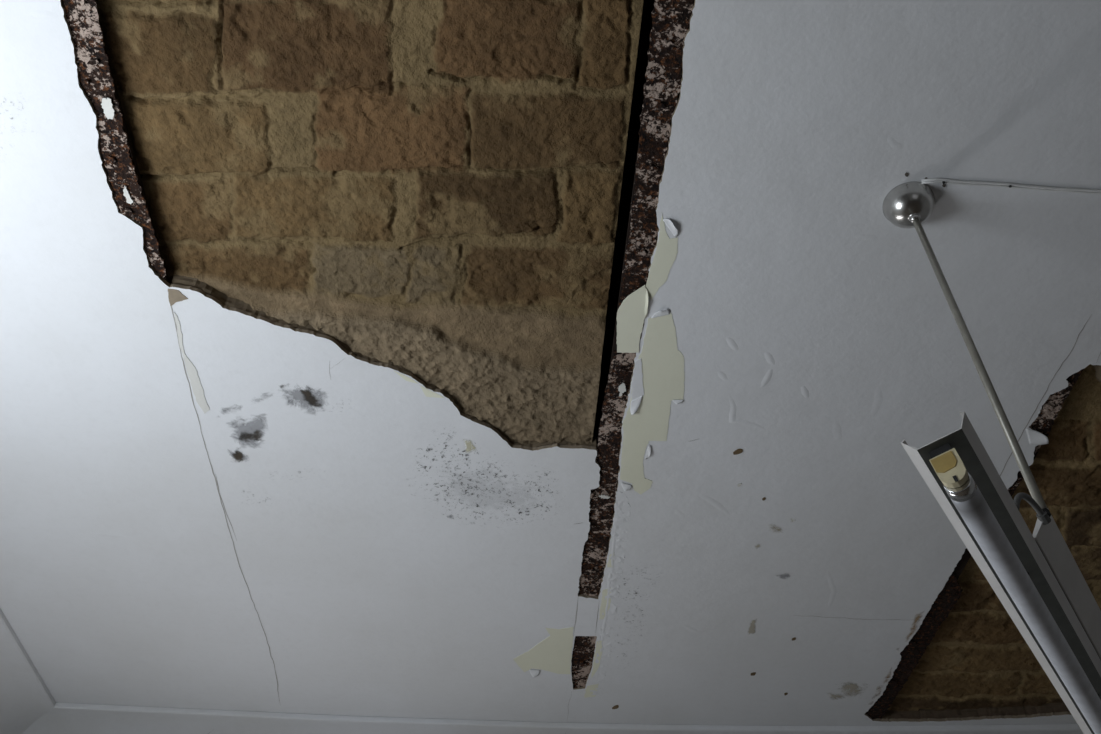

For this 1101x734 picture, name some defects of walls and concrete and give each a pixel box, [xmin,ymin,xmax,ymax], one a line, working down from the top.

spalling [95,0,685,494]
crack [171,306,280,701]
mould [231,416,264,461]
mould [281,386,322,408]
crack [1000,319,1089,476]
spalling [1011,364,1101,610]
peeling [513,627,574,677]
peeling [584,641,602,698]
spalling [879,555,1070,719]